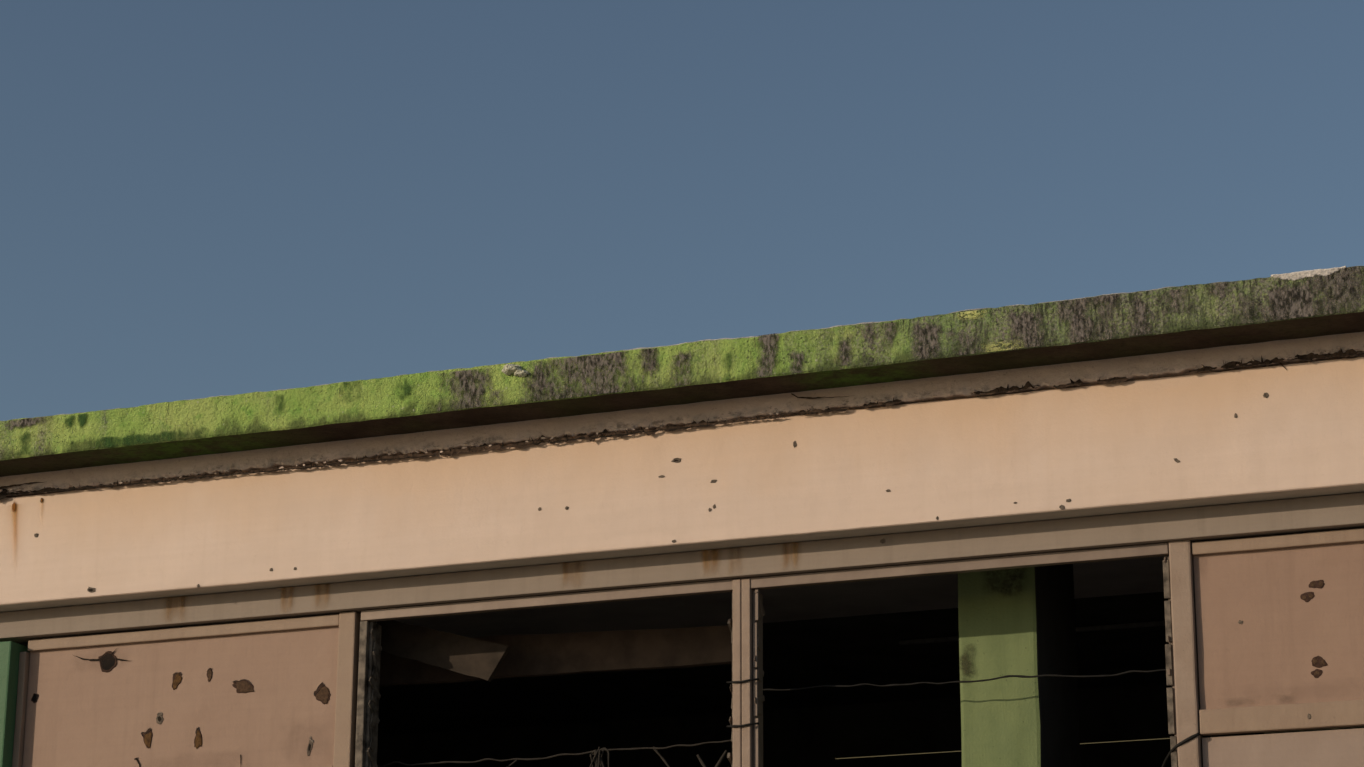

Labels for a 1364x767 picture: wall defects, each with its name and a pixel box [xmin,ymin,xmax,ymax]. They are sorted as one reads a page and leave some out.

mould [1240,266,1363,321]
mould [1057,294,1118,343]
mould [757,333,804,377]
mould [437,369,500,411]
mould [523,348,691,401]
mould [8,416,45,430]
peeling [1300,580,1325,602]
peeling [172,672,182,690]
peeling [232,679,254,693]
peeling [314,682,331,704]
peeling [1311,656,1328,678]
peeling [141,712,164,749]